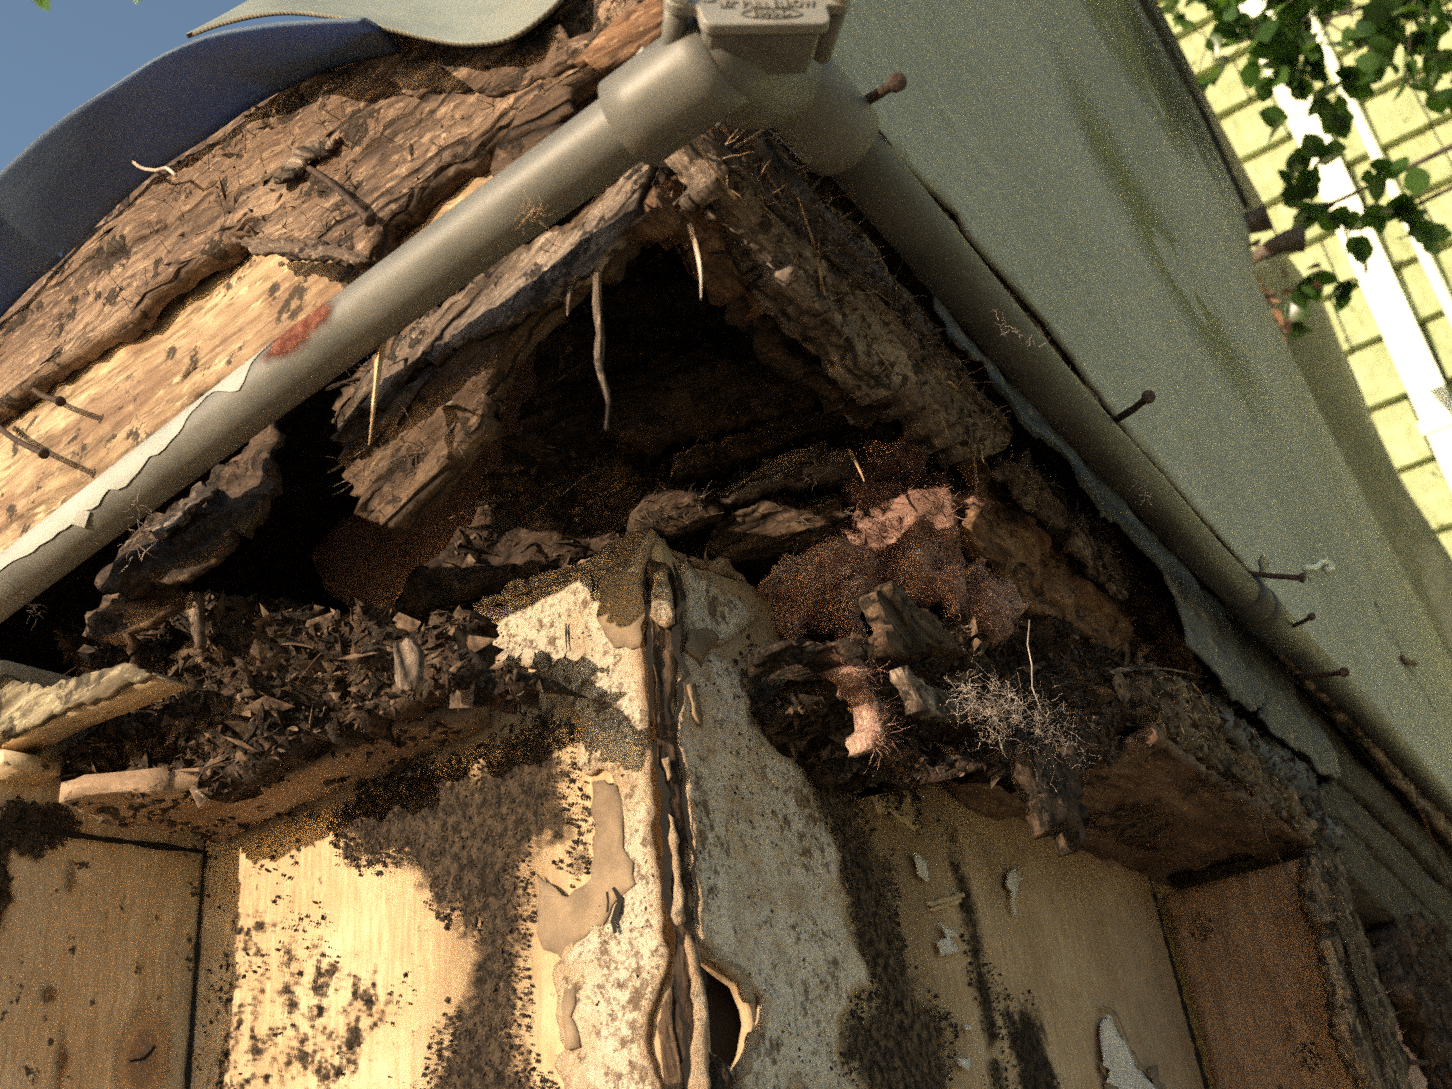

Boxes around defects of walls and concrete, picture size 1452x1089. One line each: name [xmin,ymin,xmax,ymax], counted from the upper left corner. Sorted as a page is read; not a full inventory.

peeling [53,620,120,670]
peeling [117,590,497,808]
crack [588,574,596,592]
peeling [776,609,1159,831]
water stain [0,794,83,921]
water stain [43,986,57,1002]
water stain [191,606,624,1089]
crack [606,887,623,934]
water stain [569,859,662,1007]
crack [643,558,735,1089]
water stain [686,596,1061,1089]
peeling [913,853,929,882]